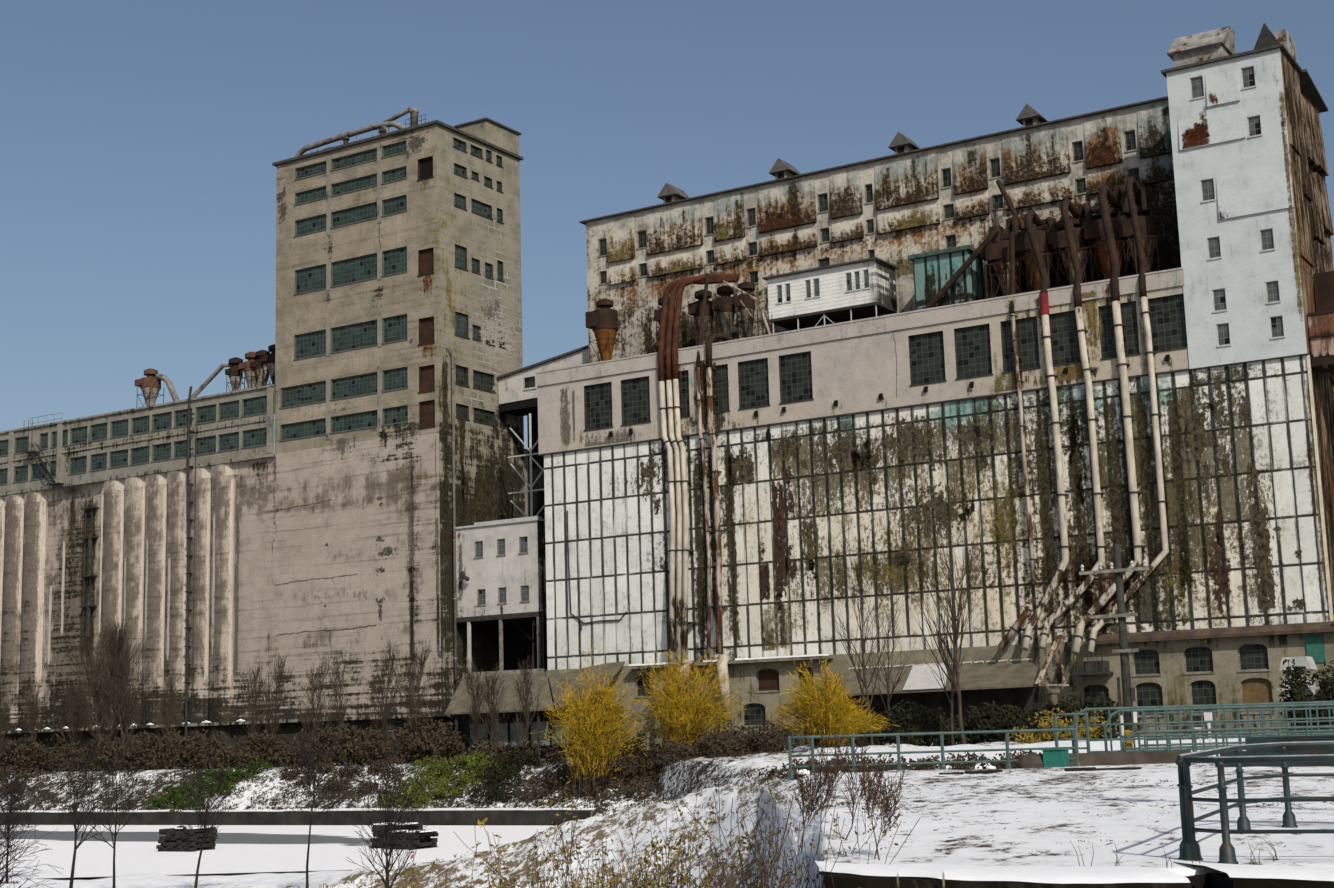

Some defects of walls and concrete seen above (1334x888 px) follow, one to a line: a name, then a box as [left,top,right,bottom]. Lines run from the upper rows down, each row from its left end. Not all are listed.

rust [761,208,802,232]
rust [1182,93,1218,149]
leakage [0,457,276,691]
leakage [380,427,416,704]
leakage [436,356,516,656]
leakage [693,440,739,644]